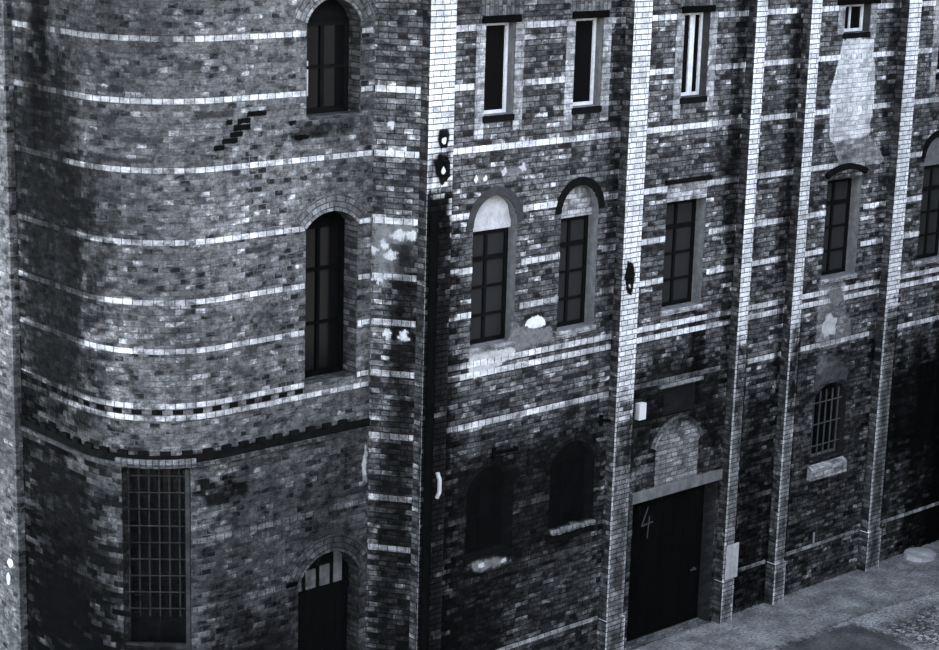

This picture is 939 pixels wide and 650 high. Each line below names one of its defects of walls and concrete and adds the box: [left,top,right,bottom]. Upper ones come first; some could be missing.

peeling [829,38,884,173]
spalling [371,218,416,288]
spalling [382,328,410,341]